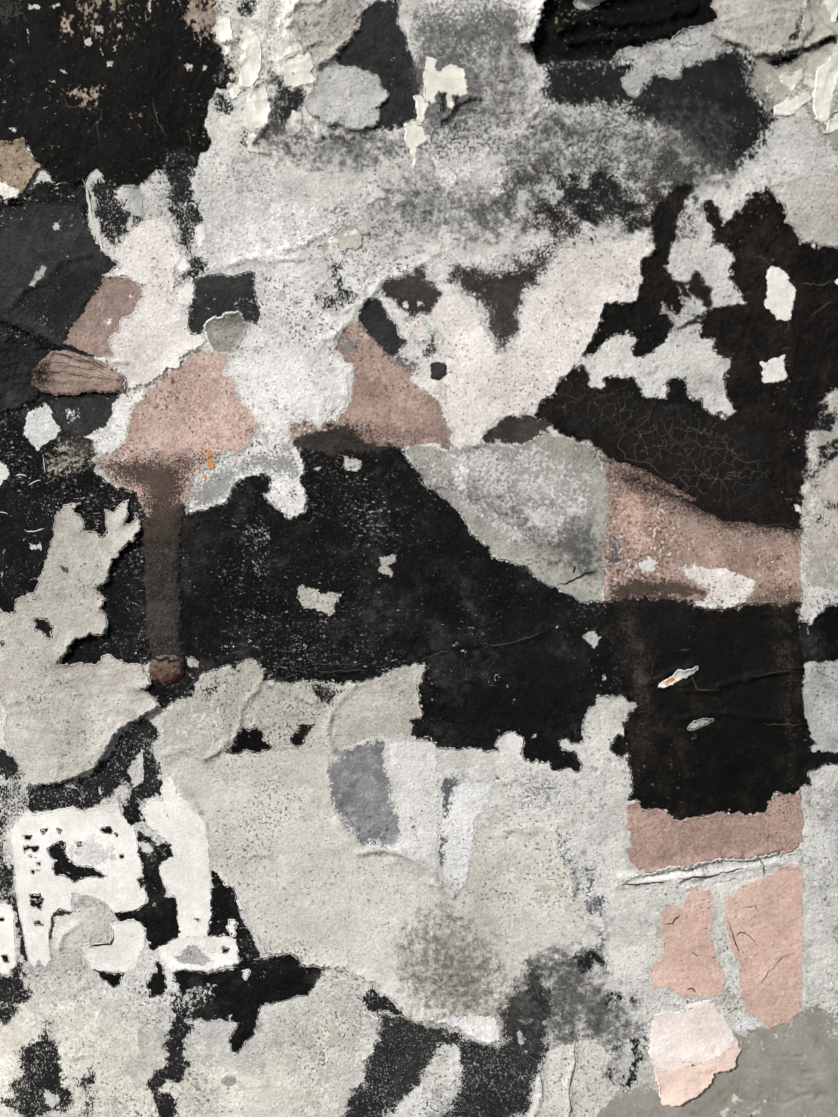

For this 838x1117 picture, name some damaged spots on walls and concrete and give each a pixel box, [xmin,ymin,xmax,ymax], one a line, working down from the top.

peeling [573,0,603,10]
peeling [753,0,838,147]
peeling [98,749,144,807]
peeling [166,935,224,966]